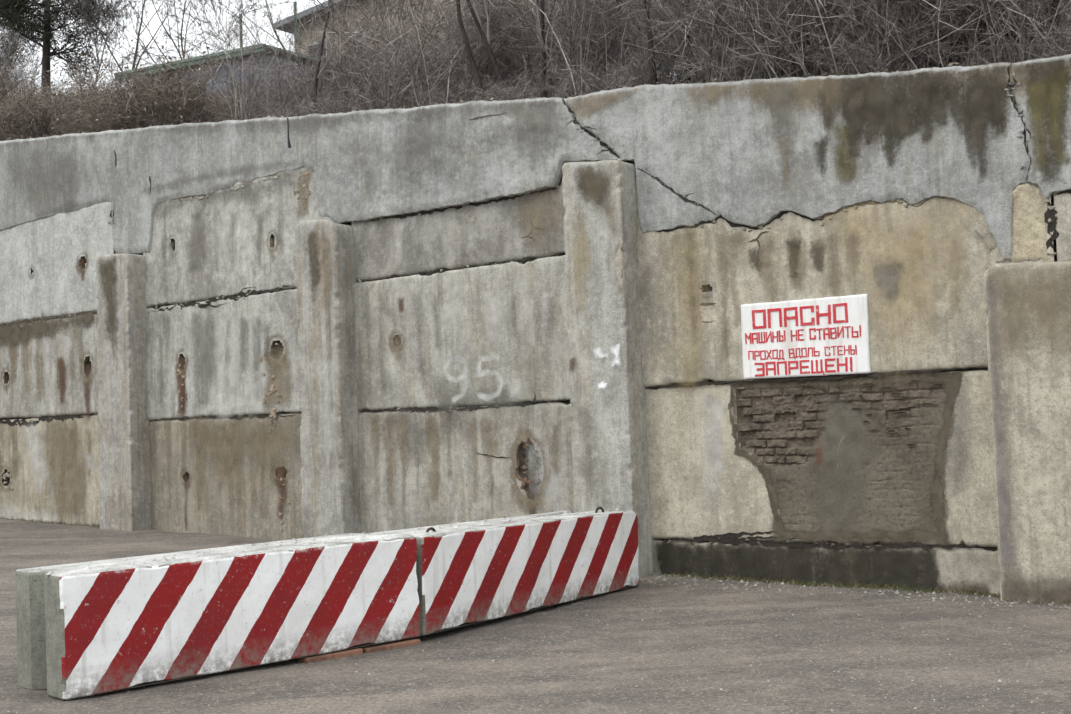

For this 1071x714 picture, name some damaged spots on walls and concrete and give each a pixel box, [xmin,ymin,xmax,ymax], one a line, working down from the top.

crack [562,98,945,253]
damp [770,67,1006,180]
crack [1004,63,1031,180]
damp [1027,60,1069,181]
crack [1044,189,1071,256]
rust [57,359,66,401]
spalling [258,329,294,437]
flaking render [728,372,962,543]